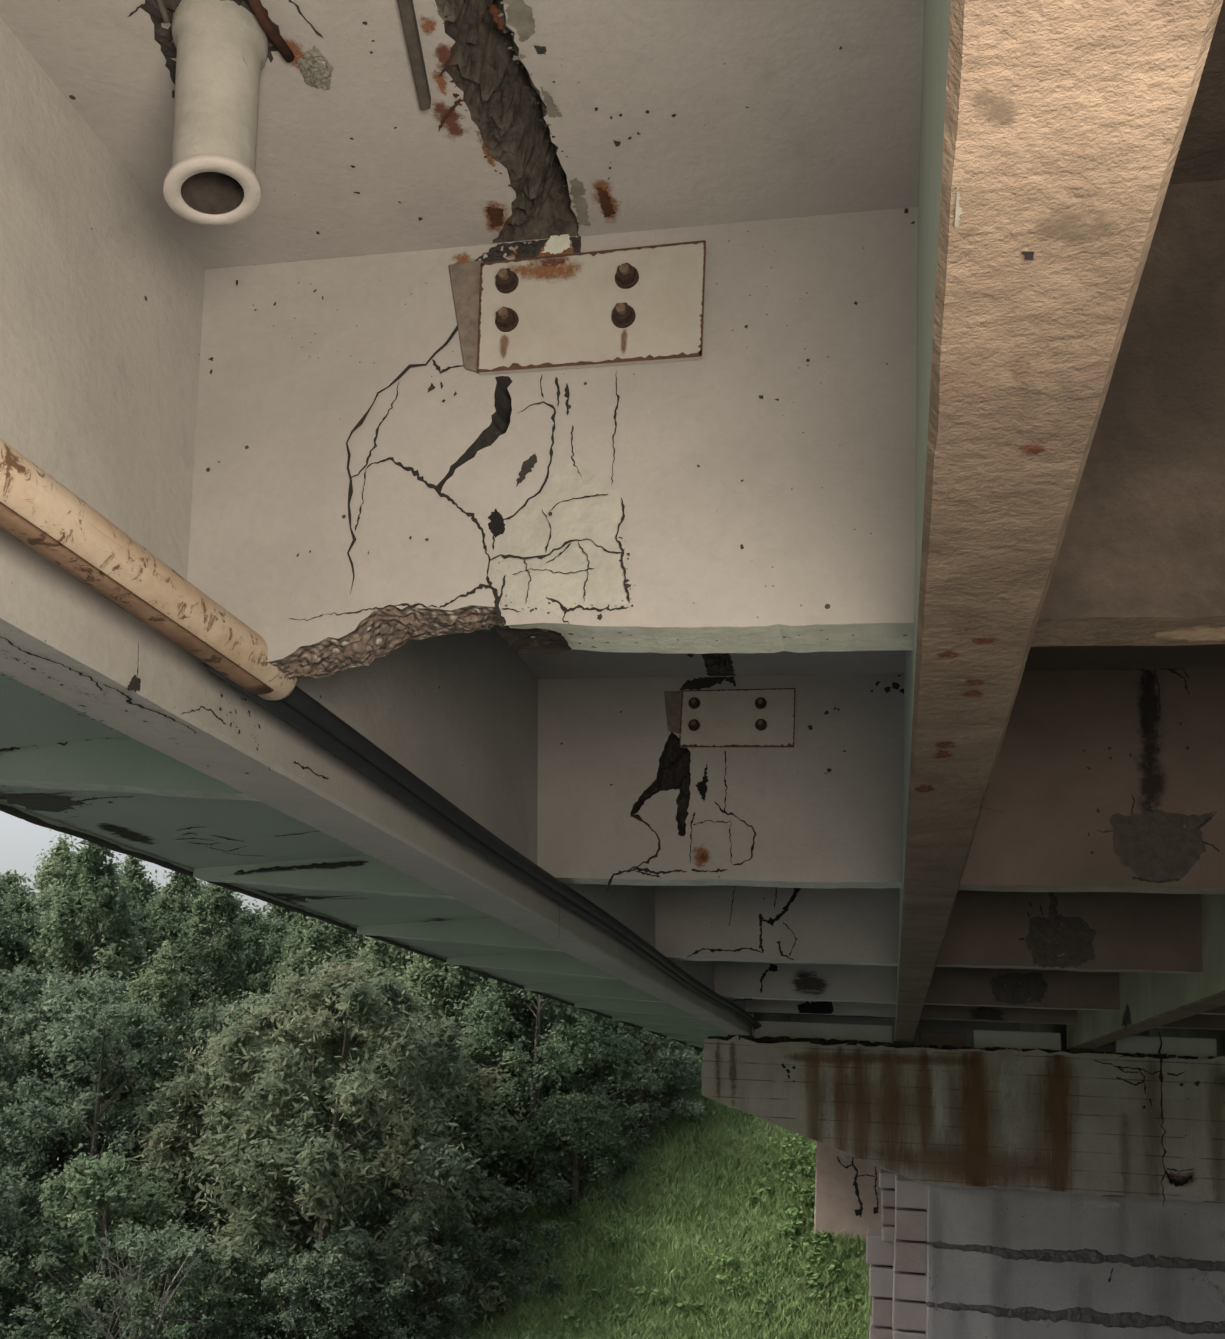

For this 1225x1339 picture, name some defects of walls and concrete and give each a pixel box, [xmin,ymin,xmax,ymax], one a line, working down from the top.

spalling [128,0,181,99]
spalling [221,0,280,62]
corrosion [421,18,435,33]
corrosion [434,45,494,166]
spalling [435,0,591,262]
crack [289,325,628,625]
spalling [268,537,635,680]
crack [605,732,827,1002]
crack [837,1157,879,1218]
crack [1094,1032,1200,1206]